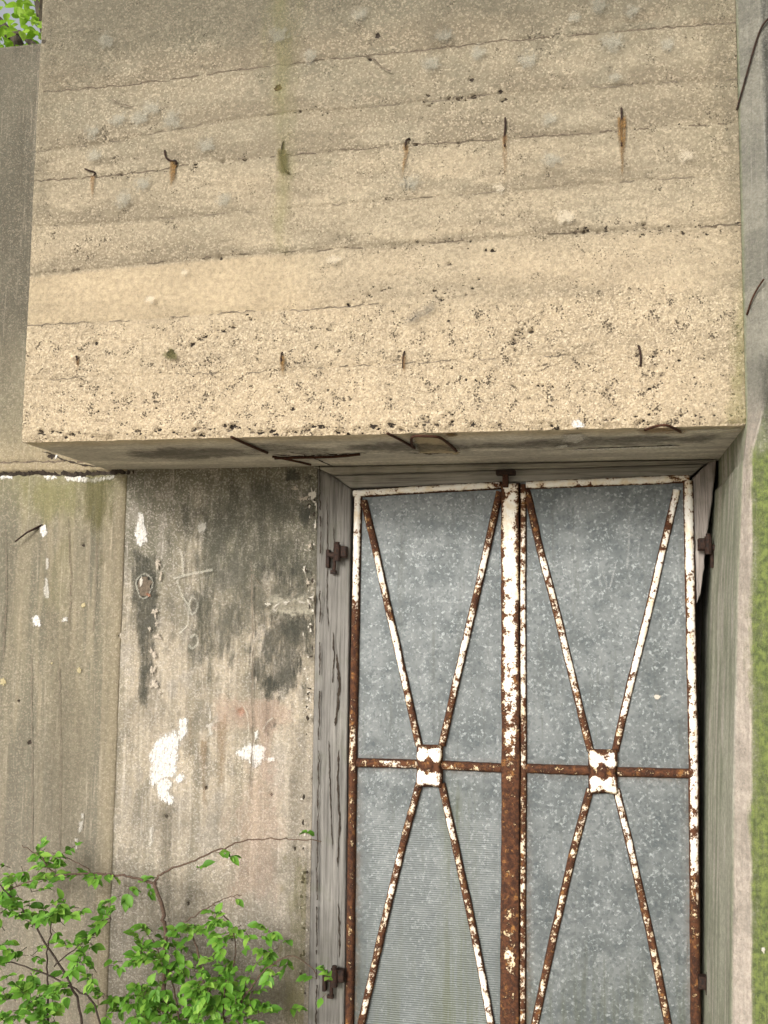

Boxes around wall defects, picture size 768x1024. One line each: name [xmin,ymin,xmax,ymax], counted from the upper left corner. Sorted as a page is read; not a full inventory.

rust [617,117,626,171]
leakage [132,513,158,703]
leakage [184,483,317,768]
leakage [149,718,188,805]